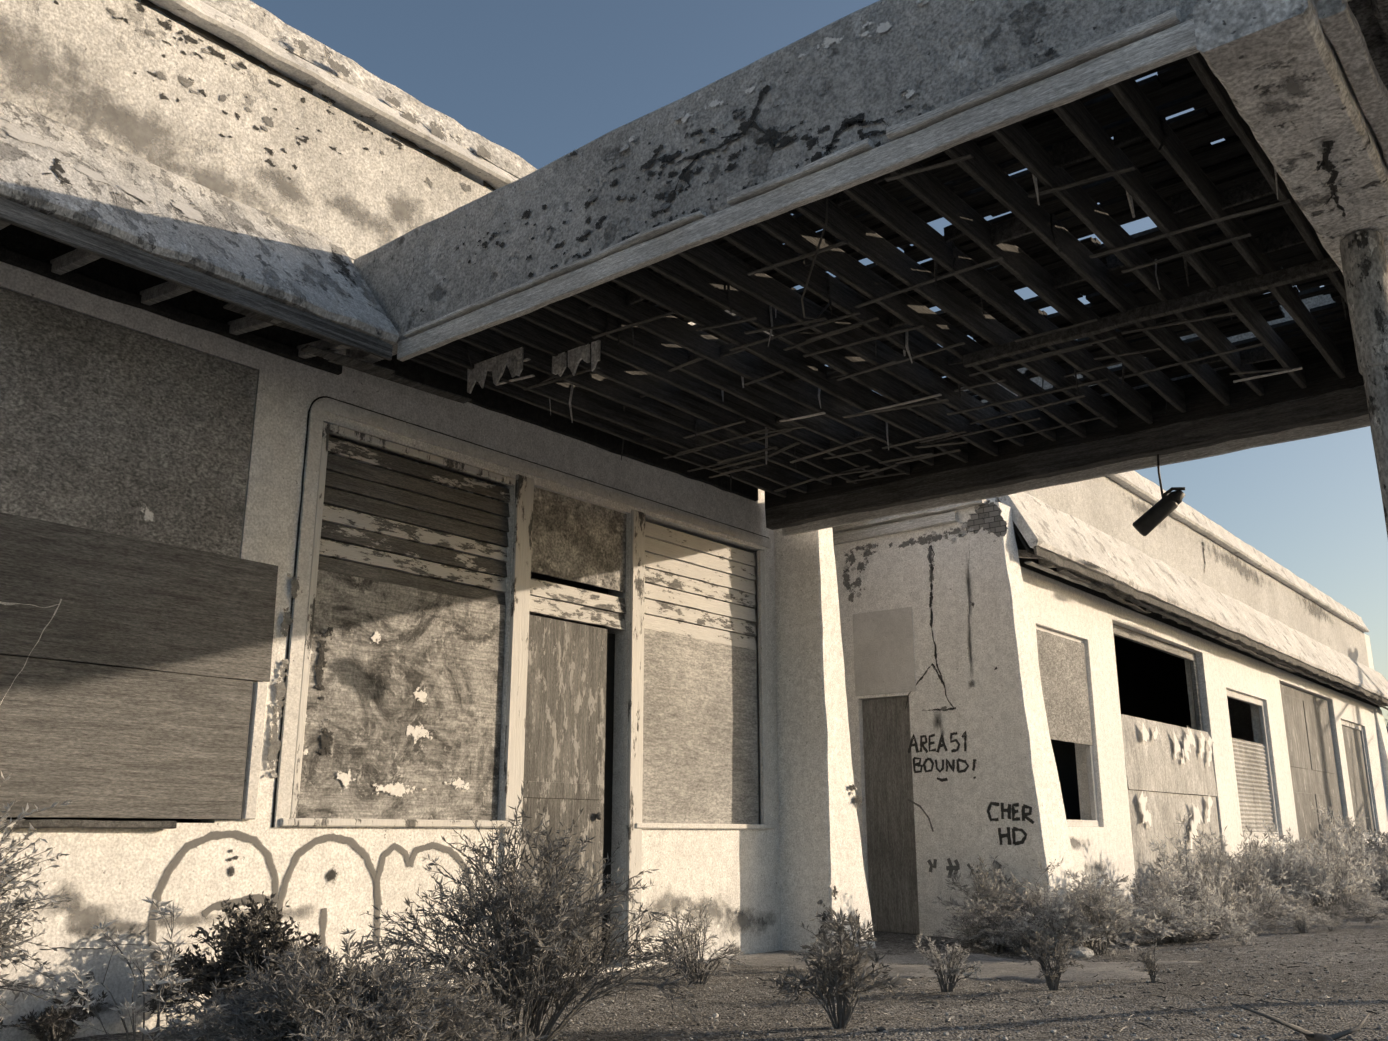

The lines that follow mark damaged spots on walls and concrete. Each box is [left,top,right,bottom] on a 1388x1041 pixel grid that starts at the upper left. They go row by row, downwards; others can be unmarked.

peeling [798,21,892,58]
peeling [0,112,155,205]
peeling [172,199,210,223]
flaking render [106,3,342,180]
spalling [353,115,404,155]
peeling [385,95,448,142]
flaking render [457,85,837,277]
crack [669,85,889,204]
crack [1316,140,1346,218]
spalling [331,247,357,286]
flaking render [843,500,1008,602]
crack [905,545,971,711]